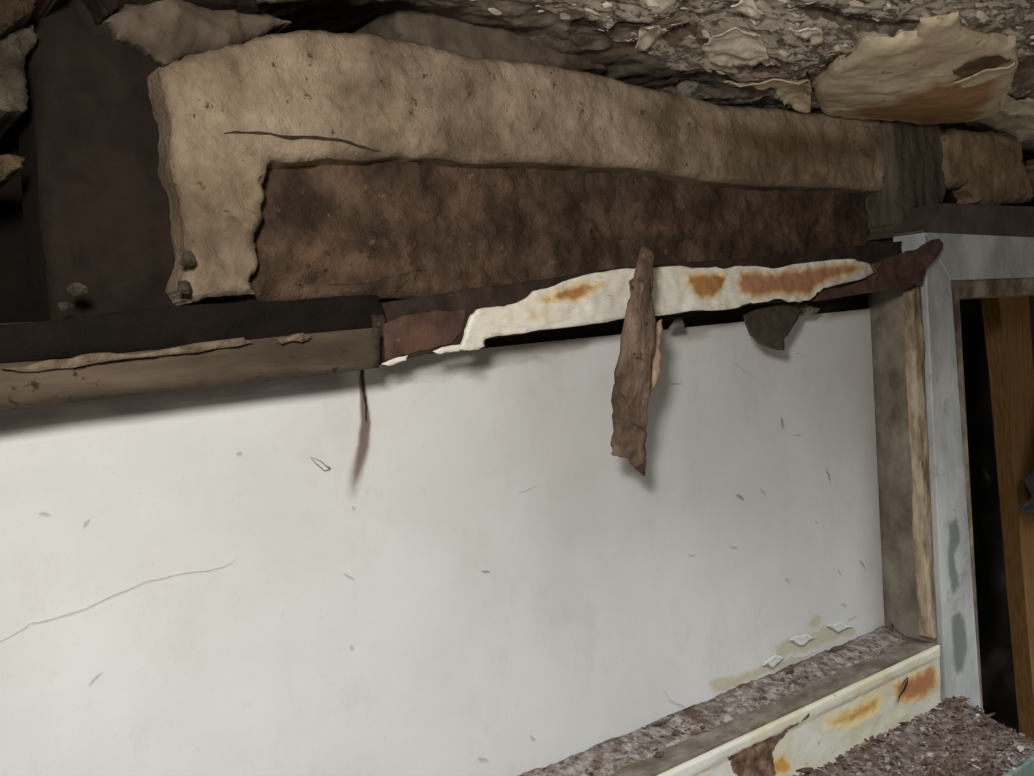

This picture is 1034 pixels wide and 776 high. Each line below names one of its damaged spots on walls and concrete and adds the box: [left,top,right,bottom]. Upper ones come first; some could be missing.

corrosion [834,61,1016,125]
peeling [995,89,1034,118]
crack [224,131,380,151]
spalling [18,0,919,322]
corrosion [682,239,943,306]
peeling [743,303,820,350]
crack [0,558,237,642]
peeling [706,611,858,696]
corrosion [727,659,940,776]